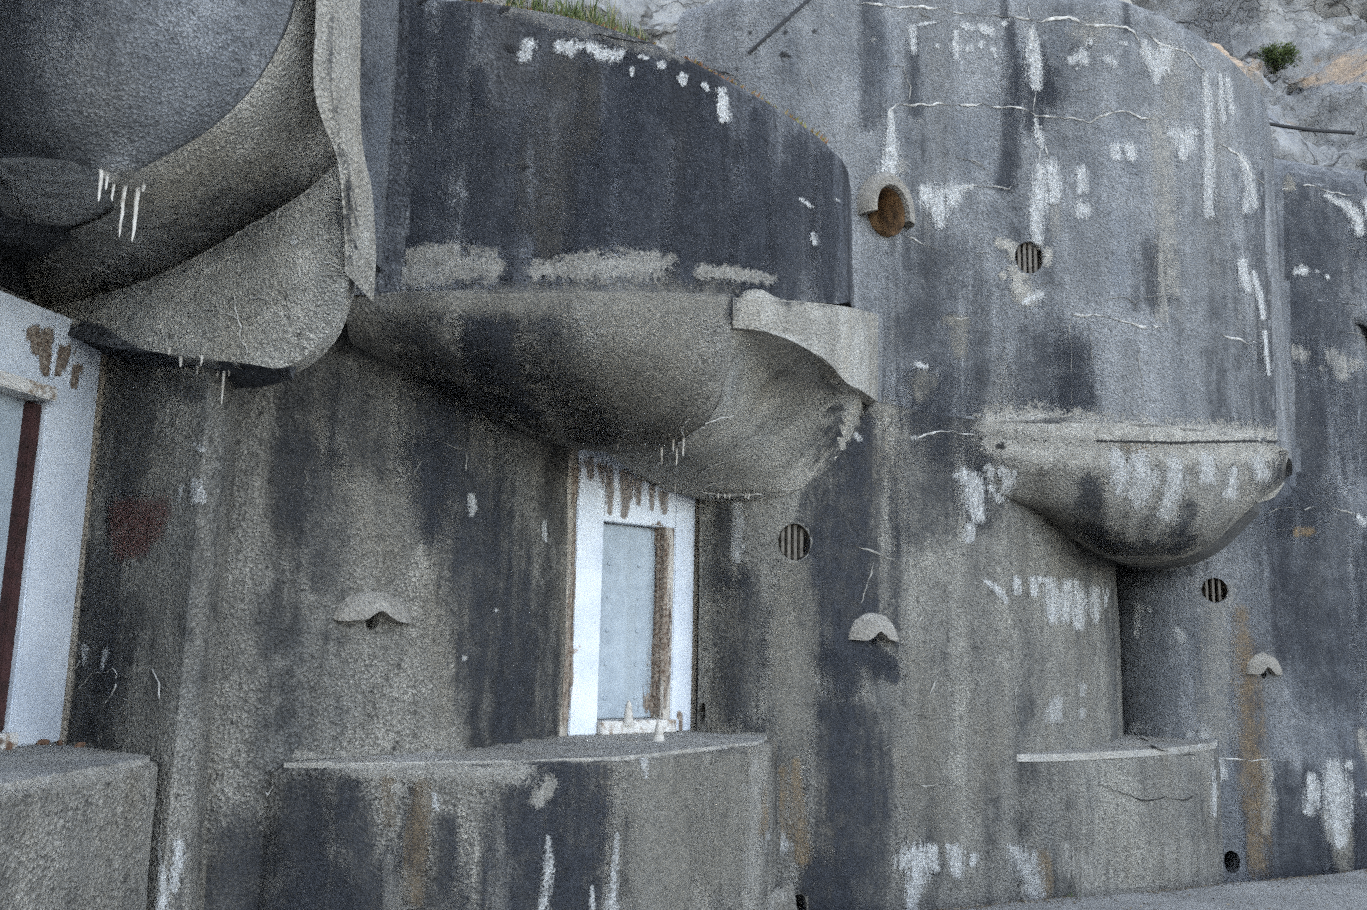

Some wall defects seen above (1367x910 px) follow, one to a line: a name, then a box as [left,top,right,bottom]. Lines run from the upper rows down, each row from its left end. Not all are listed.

leakage [405,1,840,318]
leakage [877,108,904,175]
crack [857,2,1207,193]
leakage [794,404,979,910]
leakage [1253,729,1367,880]